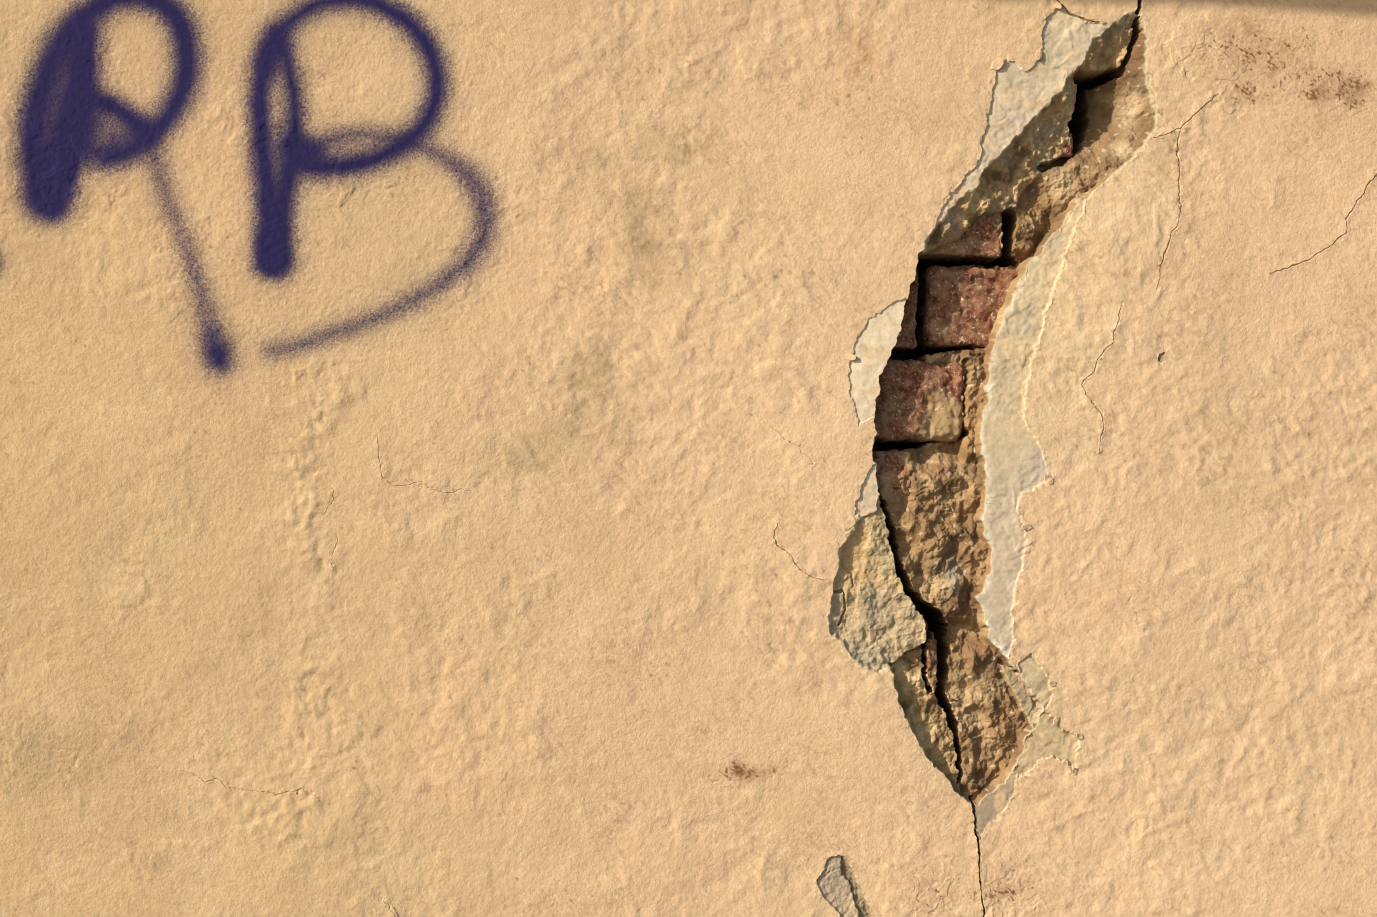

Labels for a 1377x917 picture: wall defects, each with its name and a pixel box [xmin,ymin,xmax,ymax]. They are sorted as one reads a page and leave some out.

spalling [827,0,1159,842]
spalling [816,854,871,917]
crack [975,835,986,917]